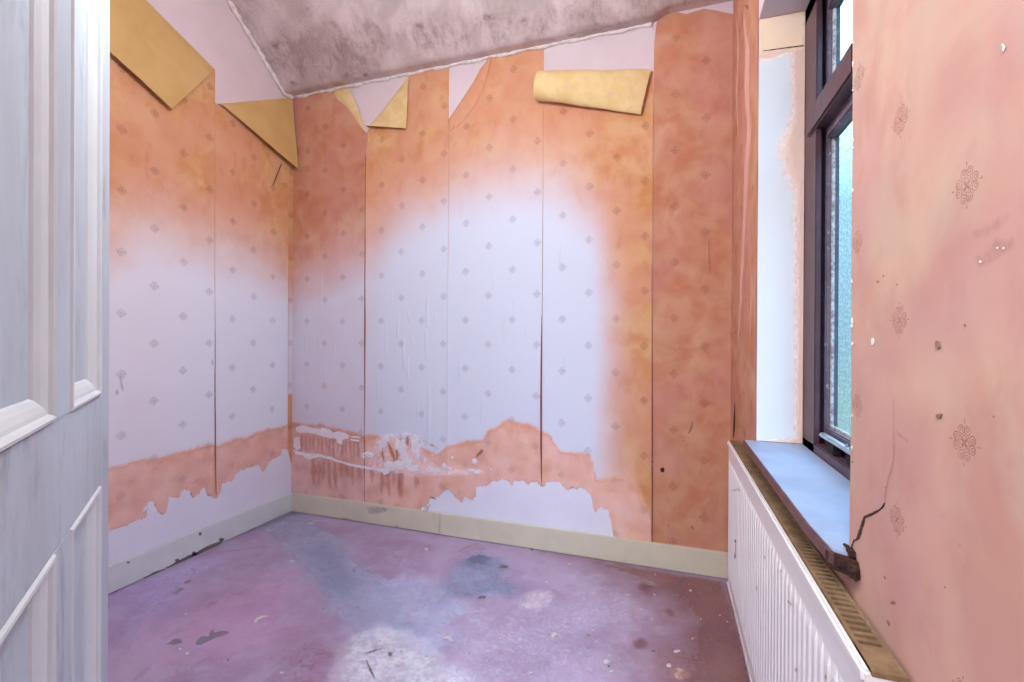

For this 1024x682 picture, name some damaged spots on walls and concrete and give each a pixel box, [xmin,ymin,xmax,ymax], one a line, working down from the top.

peeling [160,0,287,104]
peeling [347,76,408,132]
damp [109,101,654,485]
peeling [108,425,388,578]
peeling [421,478,613,536]
crack [851,503,885,547]